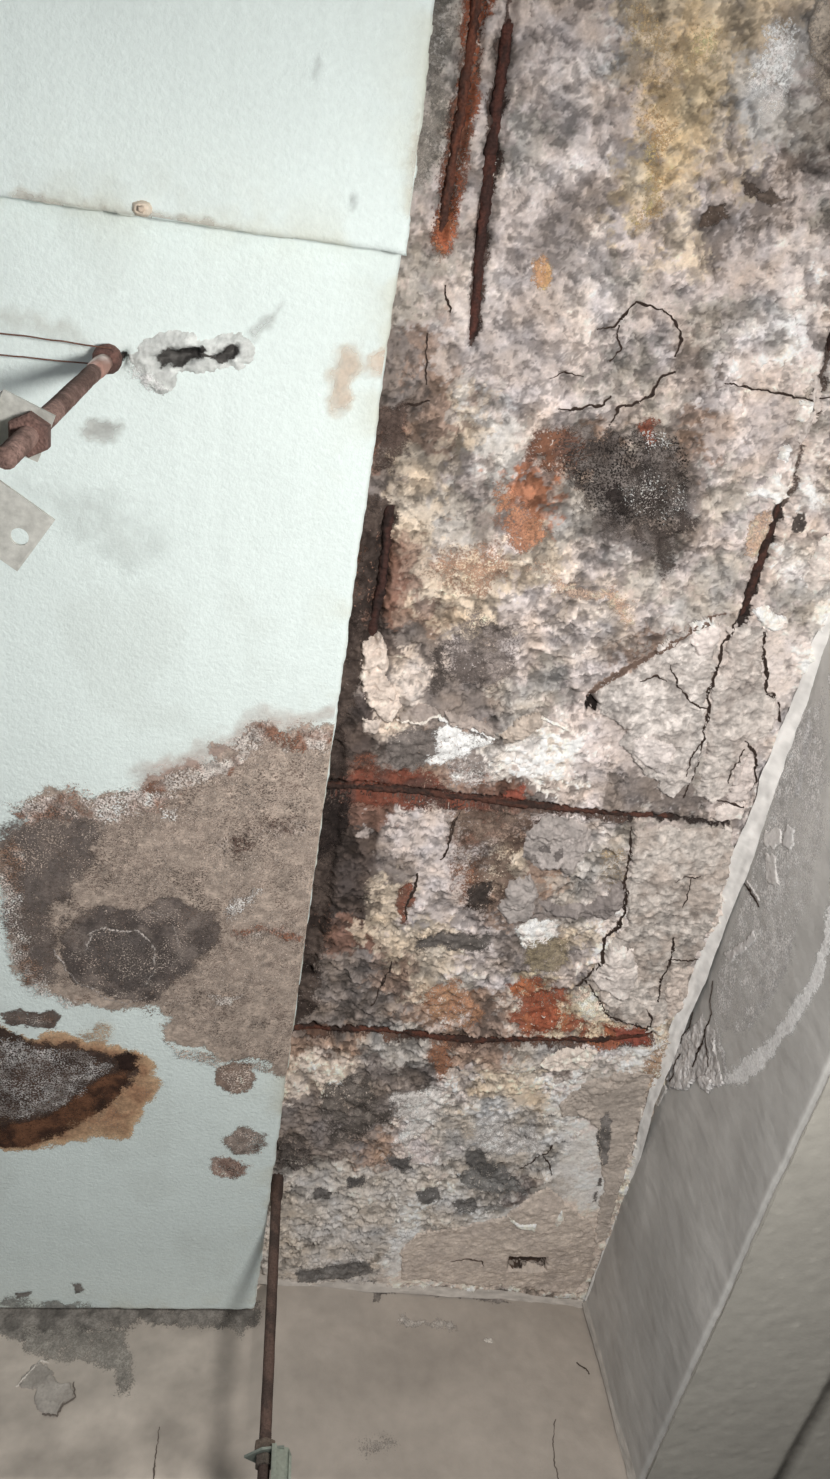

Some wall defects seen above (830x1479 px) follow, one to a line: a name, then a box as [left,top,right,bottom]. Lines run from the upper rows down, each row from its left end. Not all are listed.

corrosion [431,0,495,255]
spalling [436,0,514,346]
spalling [741,180,787,207]
leakage [371,399,412,475]
crack [550,301,684,426]
leakage [552,423,699,579]
leakage [0,494,401,1152]
corrosion [331,752,528,812]
flaking render [302,342,830,1294]
crack [586,613,781,808]
corrosion [506,938,670,1089]
crack [575,826,713,1082]